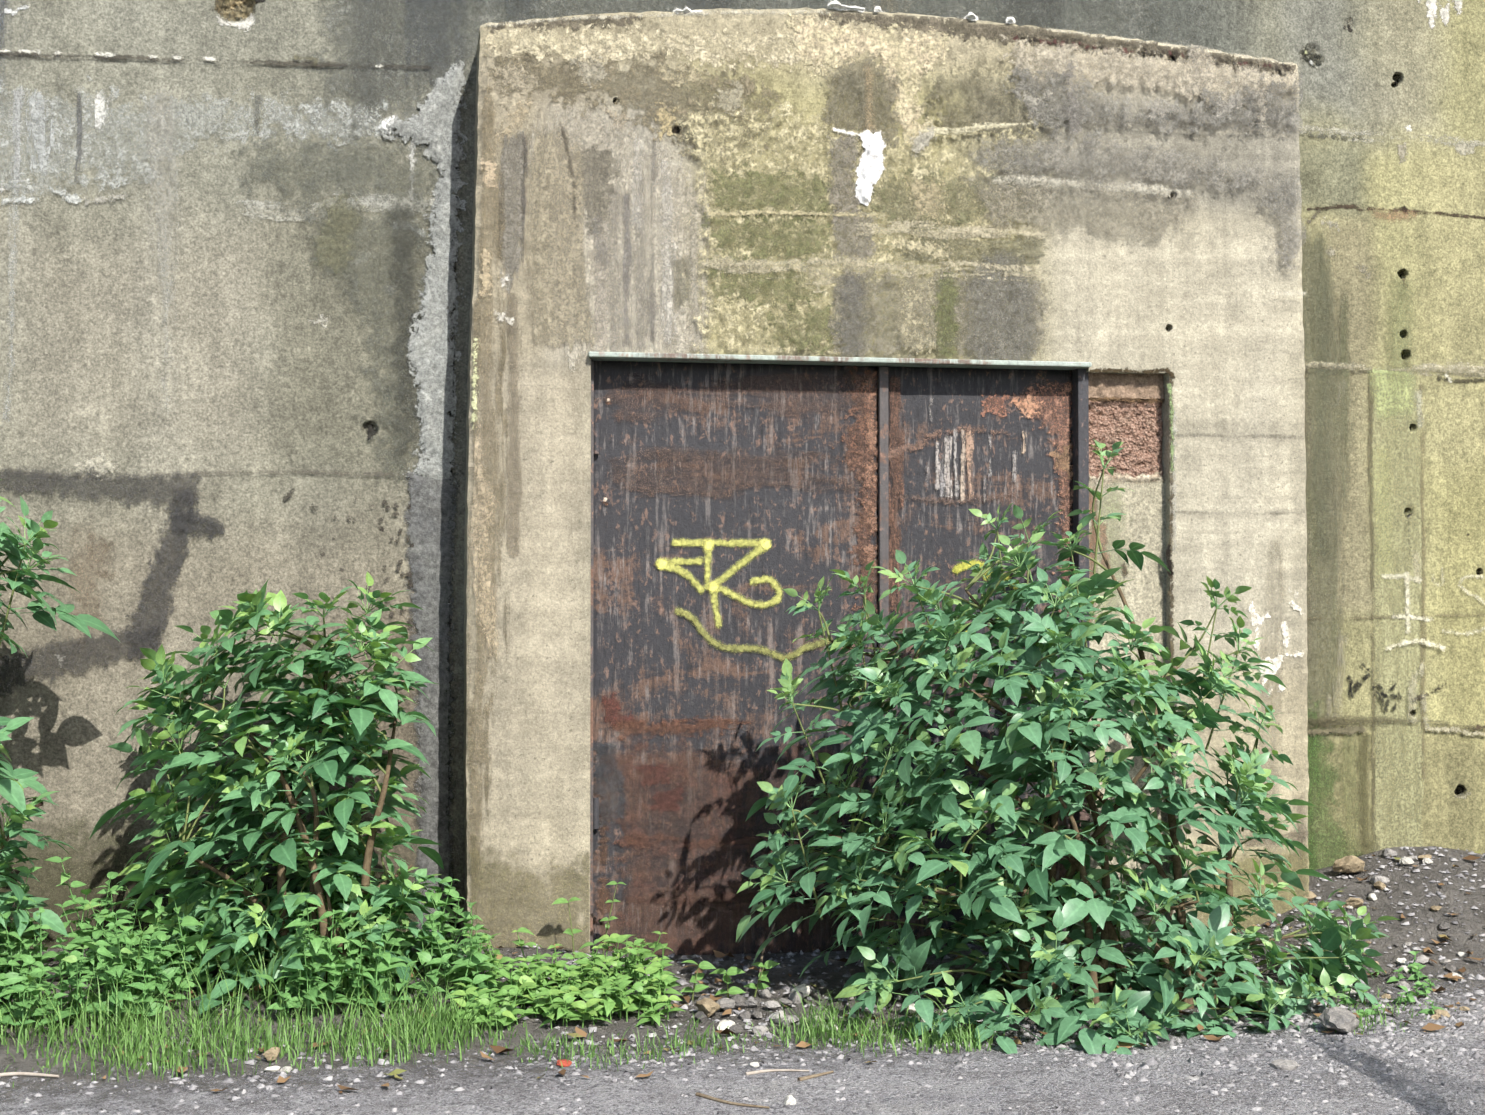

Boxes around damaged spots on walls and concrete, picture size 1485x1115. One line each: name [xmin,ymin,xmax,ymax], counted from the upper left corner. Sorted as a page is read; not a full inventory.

spalling [212,0,265,33]
crack [1307,204,1485,224]
leakage [0,0,1383,907]
rust [832,365,1128,613]
spalling [1089,471,1165,490]
crack [1089,367,1176,783]
rust [593,693,872,956]